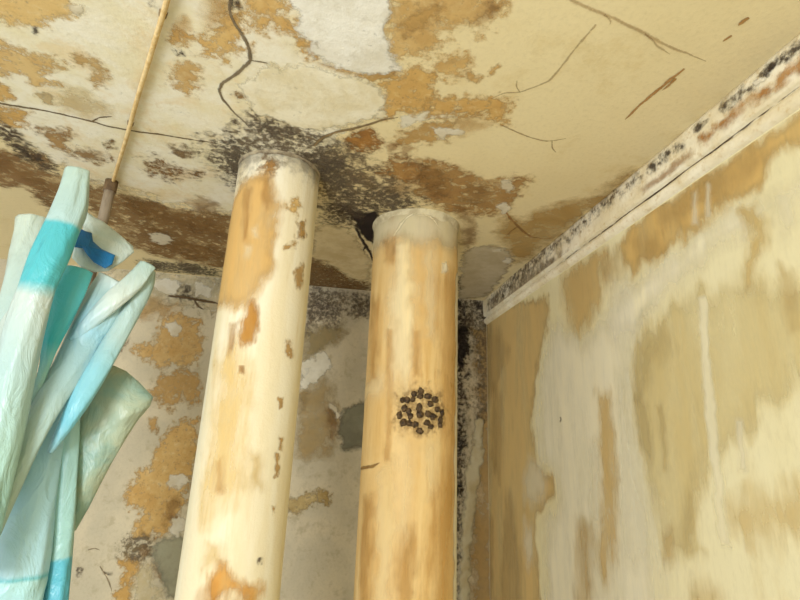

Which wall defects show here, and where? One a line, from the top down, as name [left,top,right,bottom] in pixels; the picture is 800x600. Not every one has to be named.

crack [0,103,225,146]
crack [218,0,266,128]
peeling [0,0,513,214]
crack [625,69,684,120]
damp [719,44,800,112]
damp [108,110,531,309]
crack [355,228,373,261]
damp [567,108,800,275]
peeling [300,351,331,389]
damp [389,240,444,435]
damp [453,174,641,600]
peeling [288,489,332,515]